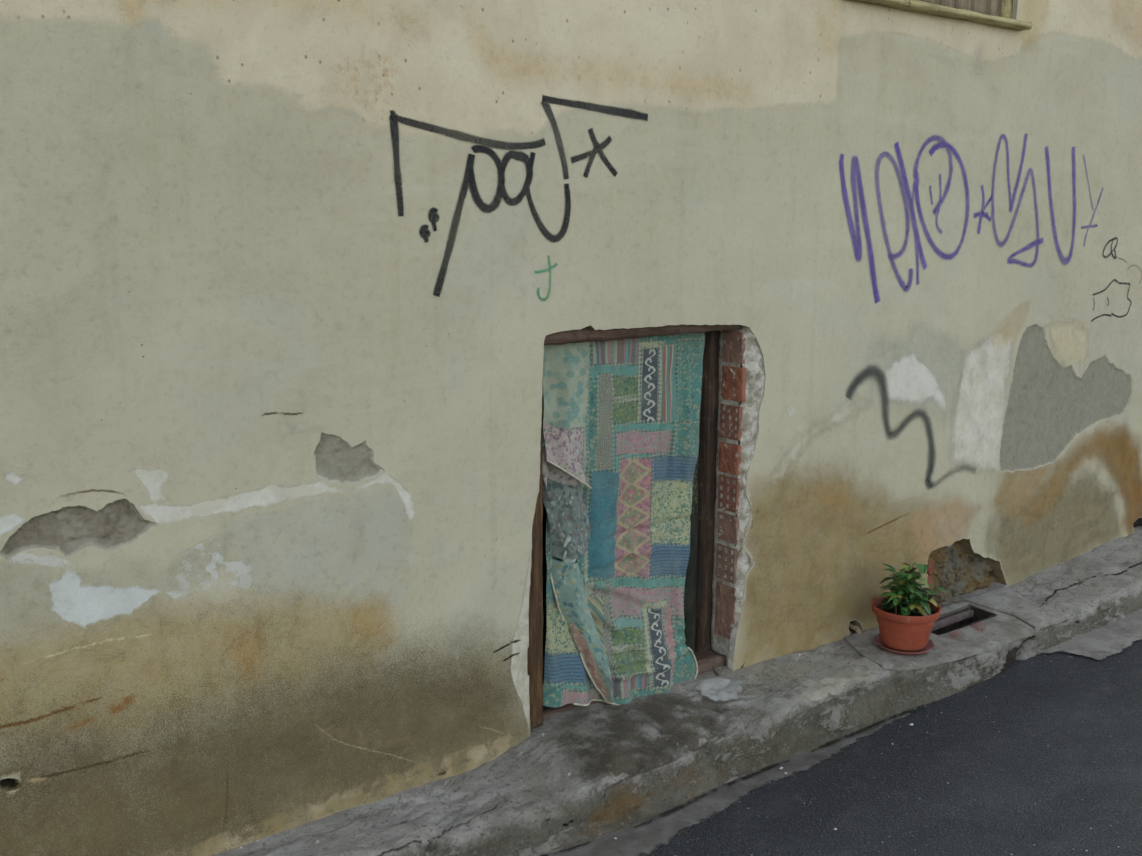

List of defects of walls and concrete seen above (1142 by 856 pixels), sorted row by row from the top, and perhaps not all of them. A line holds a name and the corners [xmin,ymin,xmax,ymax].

peeling [878,350,947,412]
spalling [1000,324,1133,472]
spalling [0,432,416,629]
spalling [711,326,765,664]
leakage [734,446,1120,669]
spalling [927,538,1007,607]
crack [1039,562,1142,607]
spalling [0,774,48,791]
leakage [0,578,531,856]
spalling [153,733,519,856]